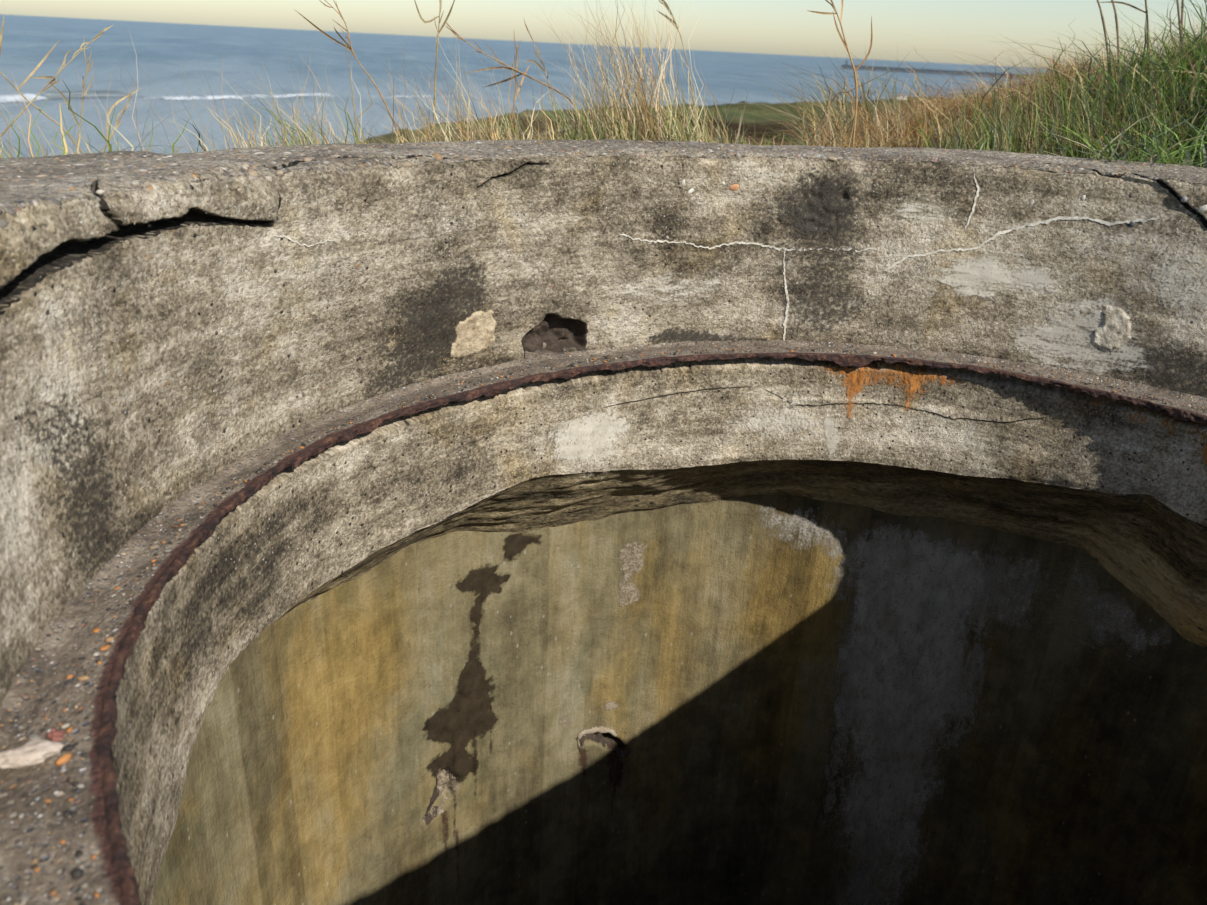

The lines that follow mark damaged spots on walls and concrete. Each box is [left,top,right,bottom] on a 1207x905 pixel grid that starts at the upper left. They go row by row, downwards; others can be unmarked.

crack [477,163,548,188]
crack [0,159,337,315]
spalling [451,241,588,359]
leakage [771,168,875,334]
crack [618,163,1207,340]
peeling [1085,259,1161,354]
corrosion [826,362,960,418]
spalling [423,769,459,825]
corrosion [442,812,459,868]
leakage [423,533,542,809]
spalling [576,726,630,758]
leakage [762,507,1049,905]